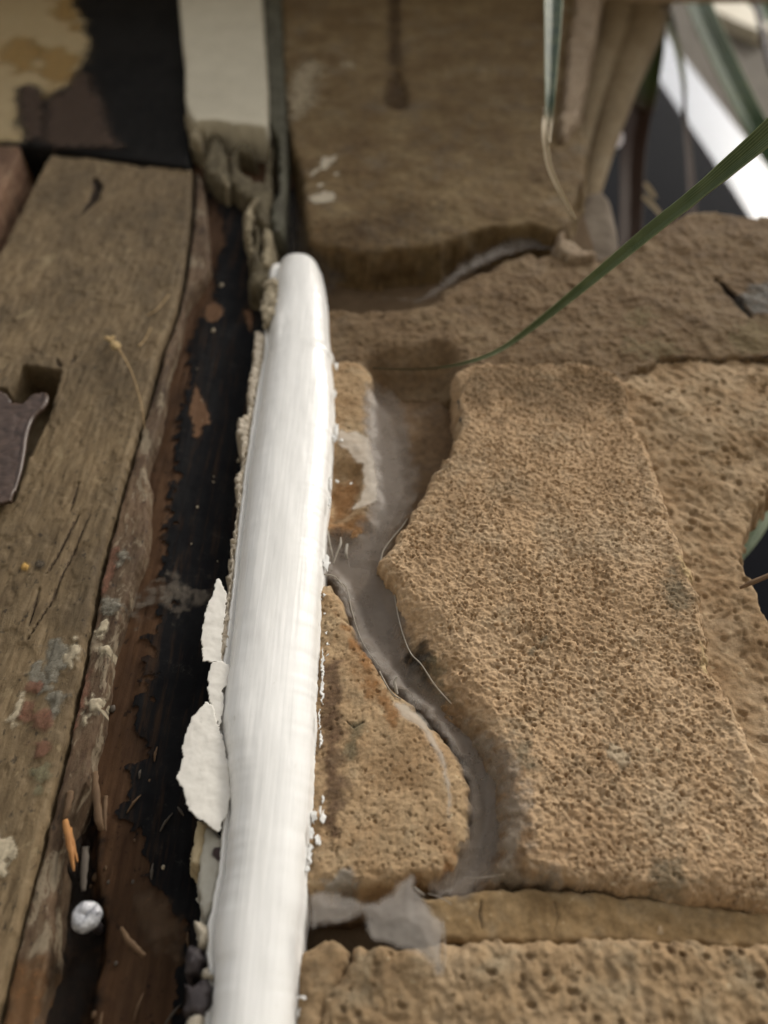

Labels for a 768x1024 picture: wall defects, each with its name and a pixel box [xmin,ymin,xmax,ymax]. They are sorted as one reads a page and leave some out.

peeling [275,189,298,264]
peeling [114,191,265,1024]
damp [320,661,346,837]
damp [402,641,432,691]